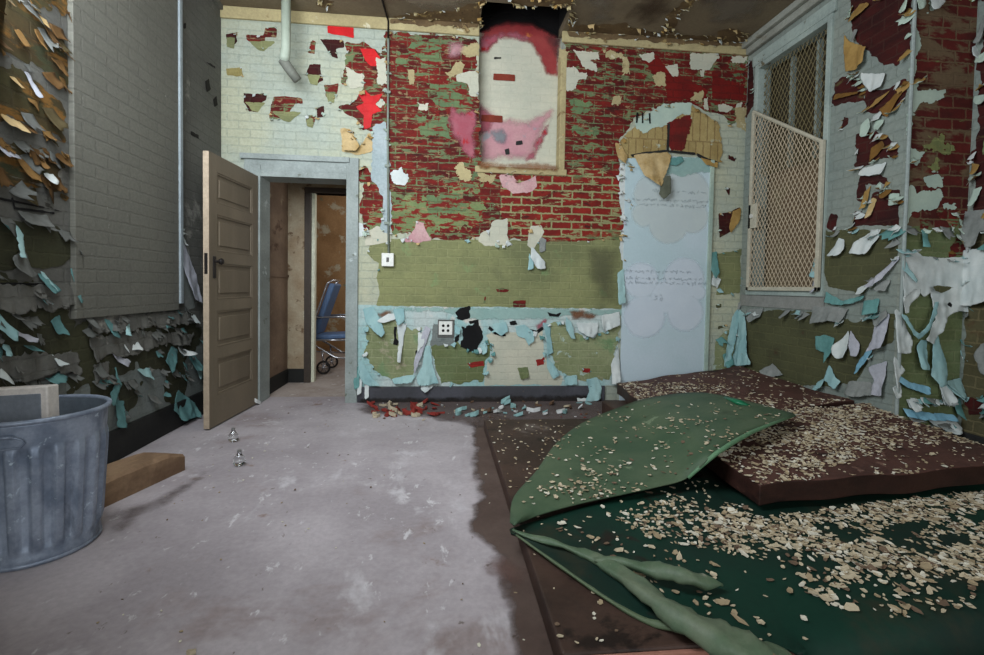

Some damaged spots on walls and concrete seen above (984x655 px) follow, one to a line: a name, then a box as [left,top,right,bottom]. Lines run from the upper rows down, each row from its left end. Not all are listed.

flaking render [226,27,277,51]
peeling [207,62,244,77]
peeling [243,0,984,618]